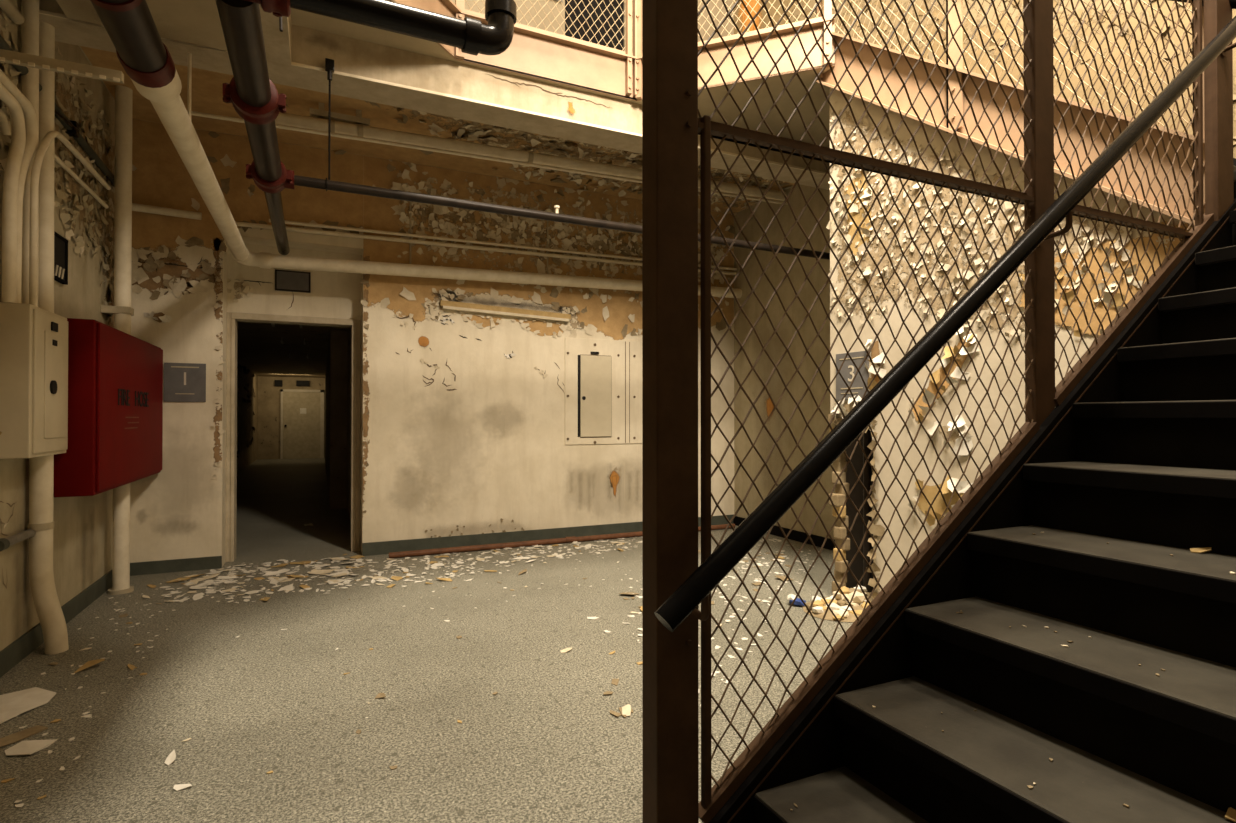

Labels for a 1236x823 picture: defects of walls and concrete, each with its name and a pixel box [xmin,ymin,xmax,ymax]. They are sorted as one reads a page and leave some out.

peeling [54,46,257,480]
peeling [175,64,642,513]
peeling [698,165,795,331]
peeling [828,339,887,432]
peeling [826,100,1024,324]
peeling [908,263,1025,455]
peeling [1054,203,1192,337]